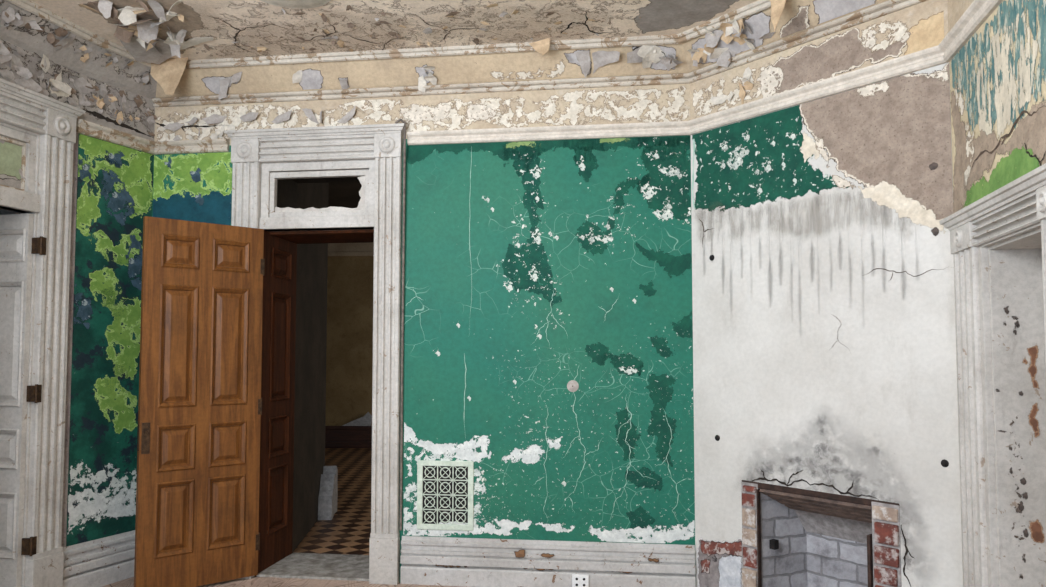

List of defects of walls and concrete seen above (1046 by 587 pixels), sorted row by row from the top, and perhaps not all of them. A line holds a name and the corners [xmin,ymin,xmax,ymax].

peeling [0,0,944,141]
crack [972,106,1046,167]
peeling [74,134,232,434]
spalling [403,0,1046,587]
rust [1023,346,1039,389]
crack [535,369,685,521]
rust [1028,403,1040,437]
peeling [68,462,137,534]
crack [751,470,879,501]
rust [1029,519,1045,543]